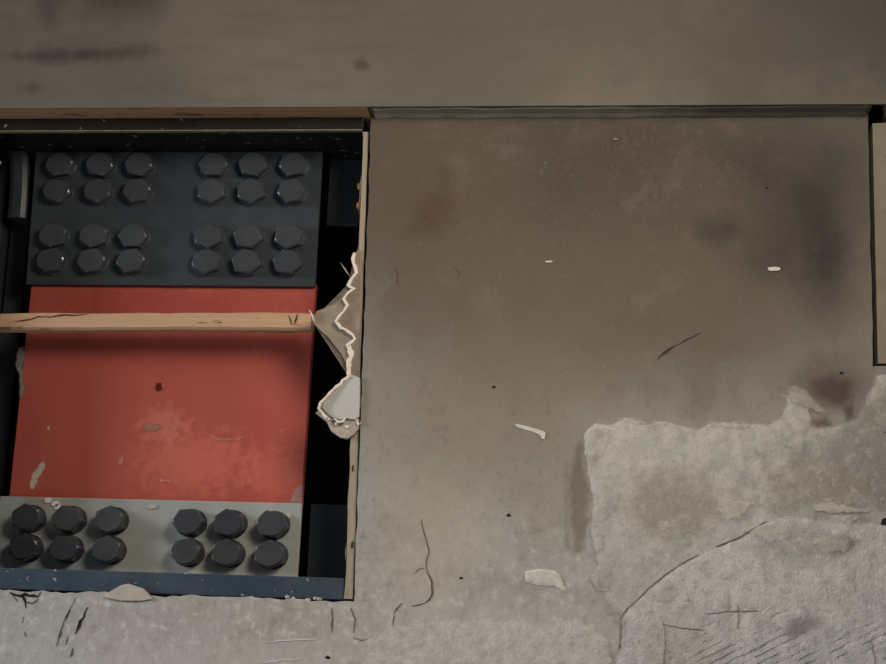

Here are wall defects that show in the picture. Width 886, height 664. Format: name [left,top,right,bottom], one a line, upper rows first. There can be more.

spalling [22,270,31,313]
spalling [316,175,367,341]
spalling [4,366,23,496]
spalling [290,326,362,577]
crack [392,521,434,627]
peeling [356,373,886,664]
crack [619,555,698,644]
crack [663,605,754,664]